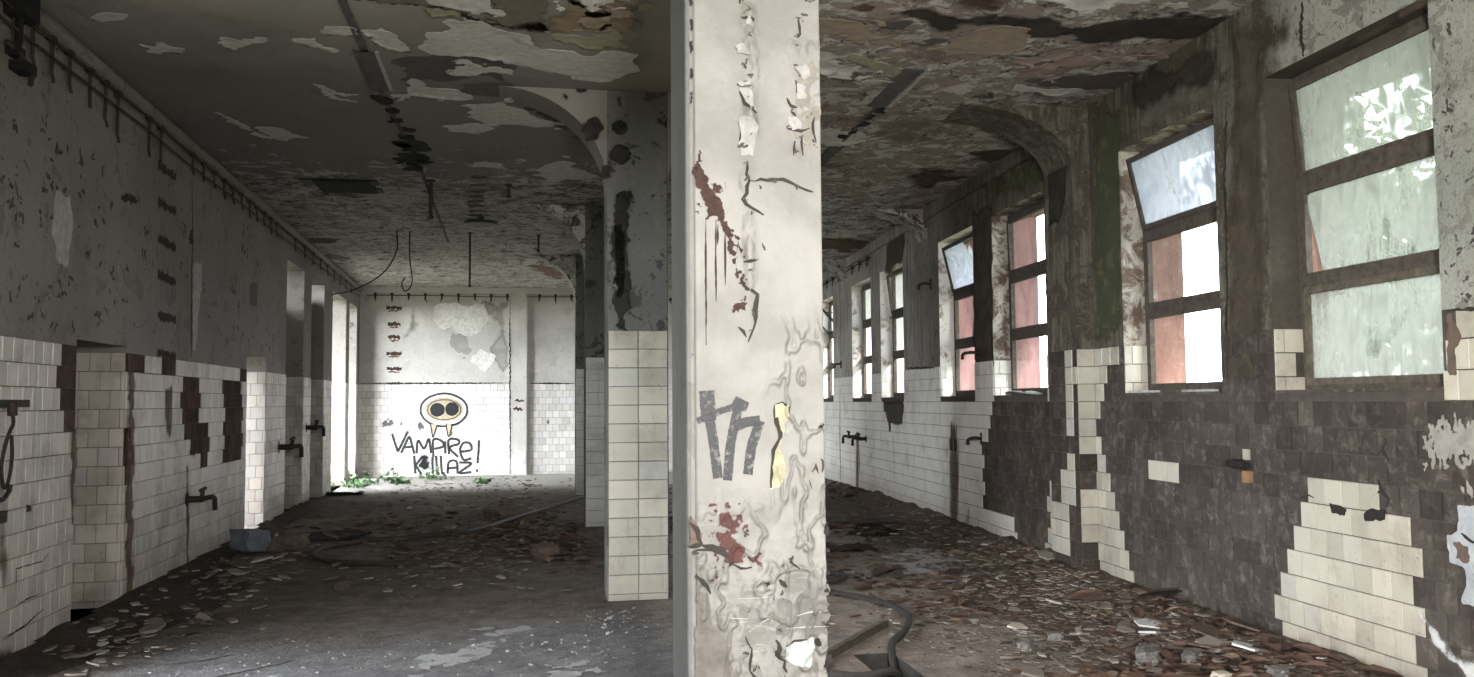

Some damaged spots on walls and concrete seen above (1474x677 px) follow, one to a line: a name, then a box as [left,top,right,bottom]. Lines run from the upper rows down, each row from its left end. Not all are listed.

peeling [433,300,496,372]
peeling [292,0,640,140]
flaking render [520,258,563,279]
peeling [533,156,598,182]
peeling [613,225,626,299]
rust [692,150,747,345]
crack [738,259,759,342]
peeling [735,0,799,215]
crack [741,162,813,216]
spalling [123,353,247,593]
peeling [982,330,1474,677]
flaking render [694,522,834,677]